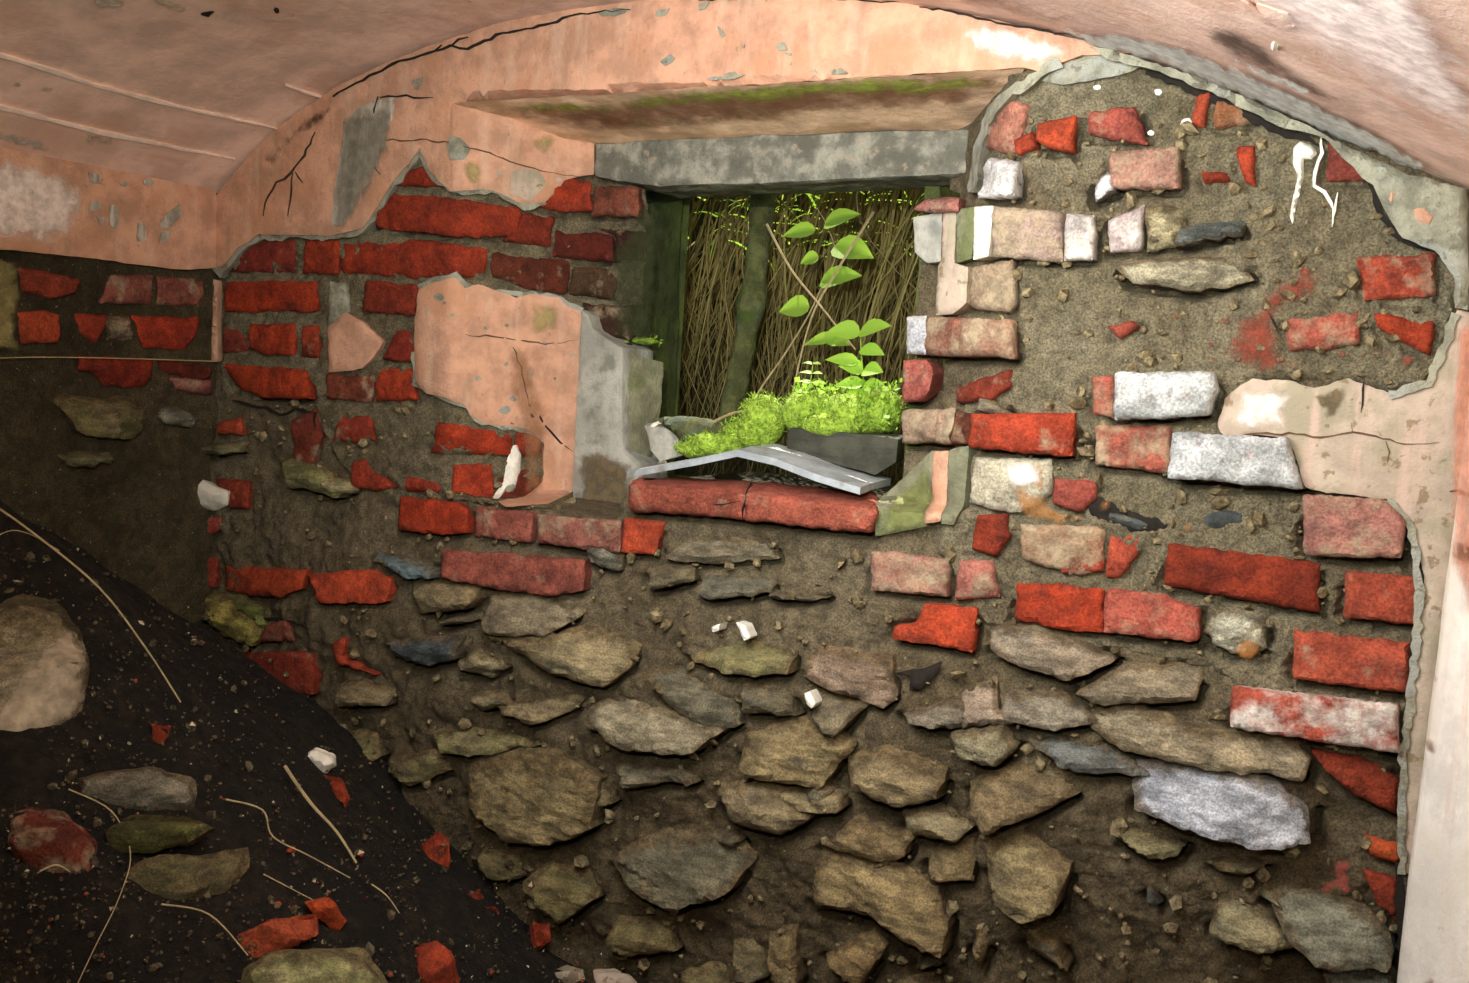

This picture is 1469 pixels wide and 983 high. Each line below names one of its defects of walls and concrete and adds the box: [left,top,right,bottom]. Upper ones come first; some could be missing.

leakage [0,165,79,239]
spalling [212,97,648,509]
crack [263,9,630,216]
spalling [936,55,1461,875]
spalling [897,661,942,690]